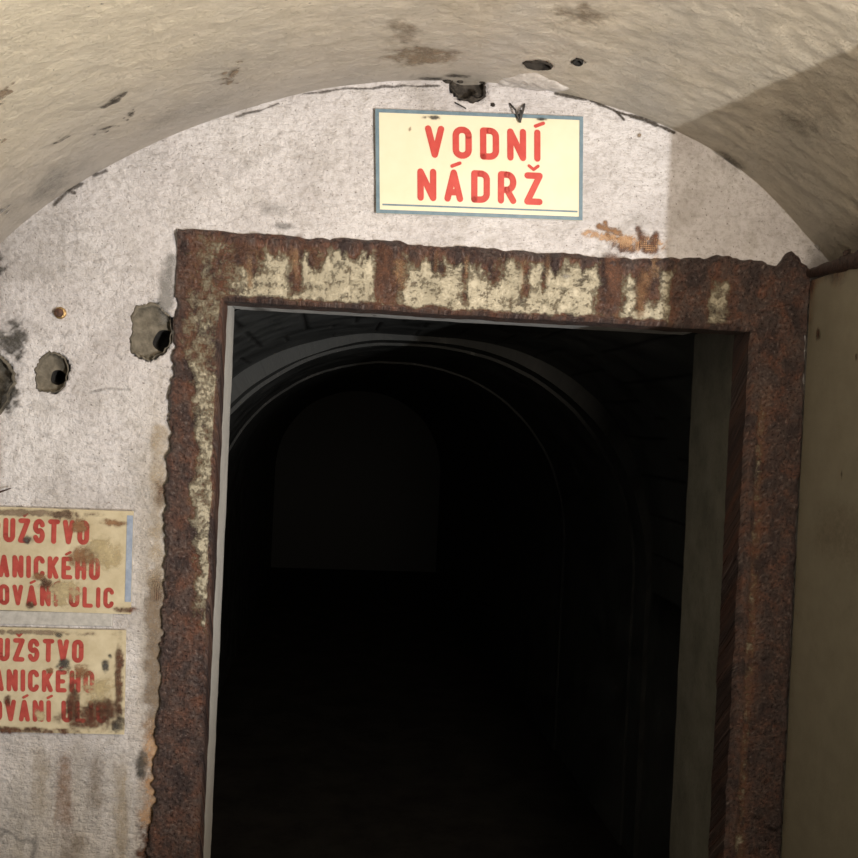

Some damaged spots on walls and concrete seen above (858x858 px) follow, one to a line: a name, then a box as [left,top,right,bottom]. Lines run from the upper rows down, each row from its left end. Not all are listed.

flaking render [523,60,553,71]
flaking render [442,79,495,107]
corrosion [584,221,662,297]
corrosion [806,249,858,278]
leakage [0,321,27,361]
flaking render [129,302,173,362]
flaking render [0,355,17,415]
leakage [1,374,19,413]
flaking render [34,351,69,393]
corrosion [136,574,164,858]